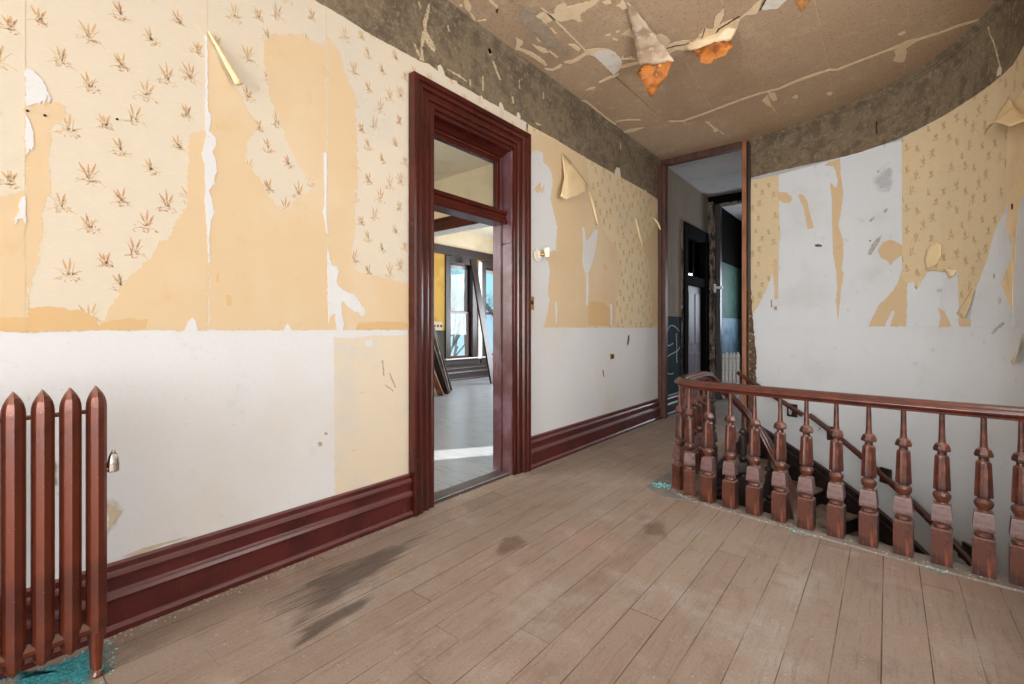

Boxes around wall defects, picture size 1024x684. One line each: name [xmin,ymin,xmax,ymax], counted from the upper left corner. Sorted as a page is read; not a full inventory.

peeling [459,0,498,22]
peeling [515,0,639,90]
peeling [656,0,786,54]
flaking render [24,68,51,154]
flaking render [201,35,217,263]
flaking render [14,196,27,225]
flaking render [185,318,198,332]
flaking render [326,249,365,331]
flaking render [531,150,558,329]
flaking render [582,227,598,305]
flaking render [748,140,1024,430]